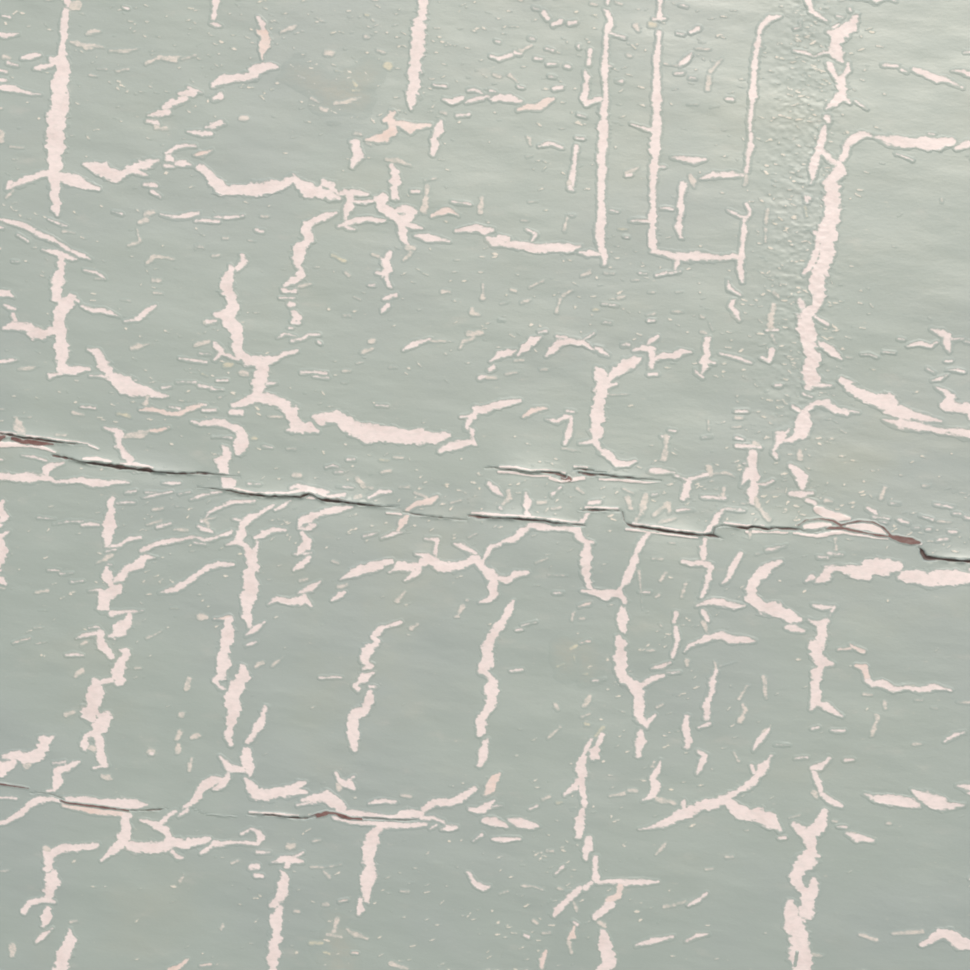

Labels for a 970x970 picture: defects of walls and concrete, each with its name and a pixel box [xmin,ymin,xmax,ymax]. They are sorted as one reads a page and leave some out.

peeling [427,34,573,159]
peeling [658,153,745,241]
peeling [0,211,108,282]
peeling [287,455,463,542]
crack [0,161,846,970]
peeling [620,482,789,587]
peeling [796,482,970,562]
crack [678,537,970,720]
peeling [678,659,738,778]
peeling [59,799,131,813]
crack [860,780,970,814]
crack [916,925,970,952]